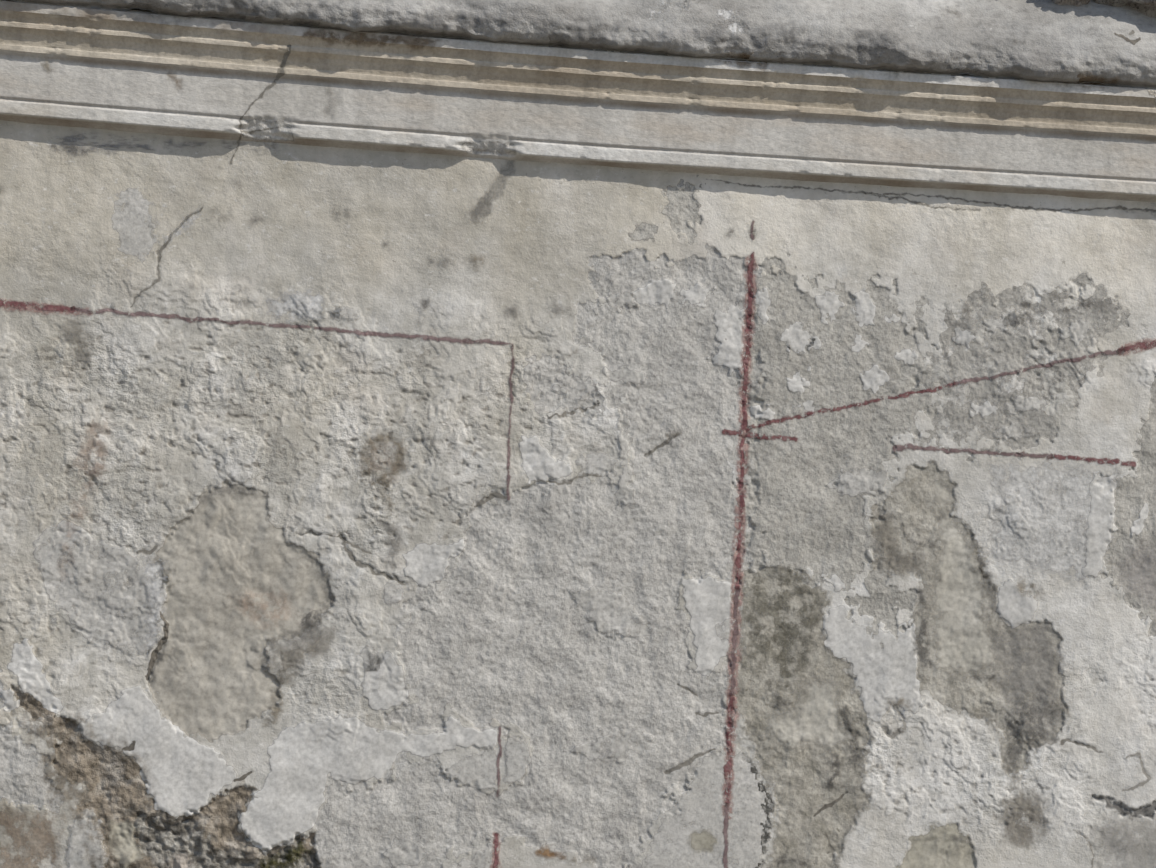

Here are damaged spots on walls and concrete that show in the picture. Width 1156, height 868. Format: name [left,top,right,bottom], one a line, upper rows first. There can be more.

crack [230,45,291,164]
crack [134,207,203,302]
flaking render [0,175,1130,868]
leakage [1003,795,1046,845]
crack [1061,739,1156,817]